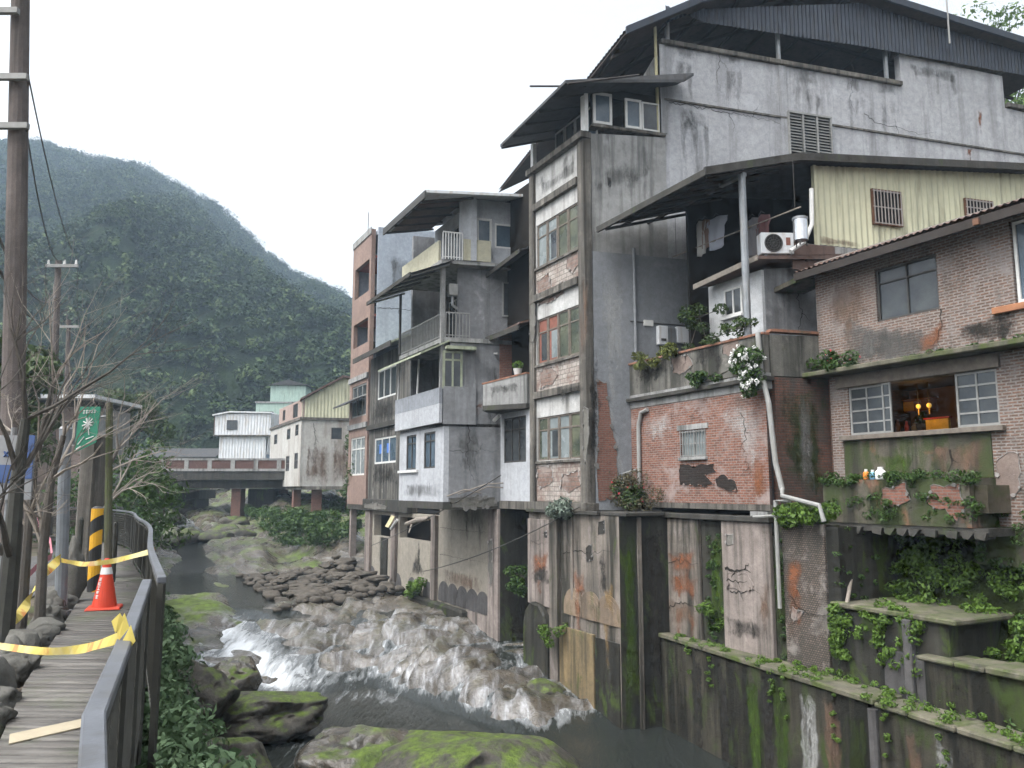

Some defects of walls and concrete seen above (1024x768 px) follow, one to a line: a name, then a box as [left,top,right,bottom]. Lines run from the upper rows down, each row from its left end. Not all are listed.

peeling [529,251,578,343]
peeling [670,354,693,375]
peeling [536,379,618,501]
spalling [679,463,738,492]
spalling [880,482,911,508]
spalling [926,483,966,521]
peeling [995,451,1021,501]
crack [725,564,760,601]